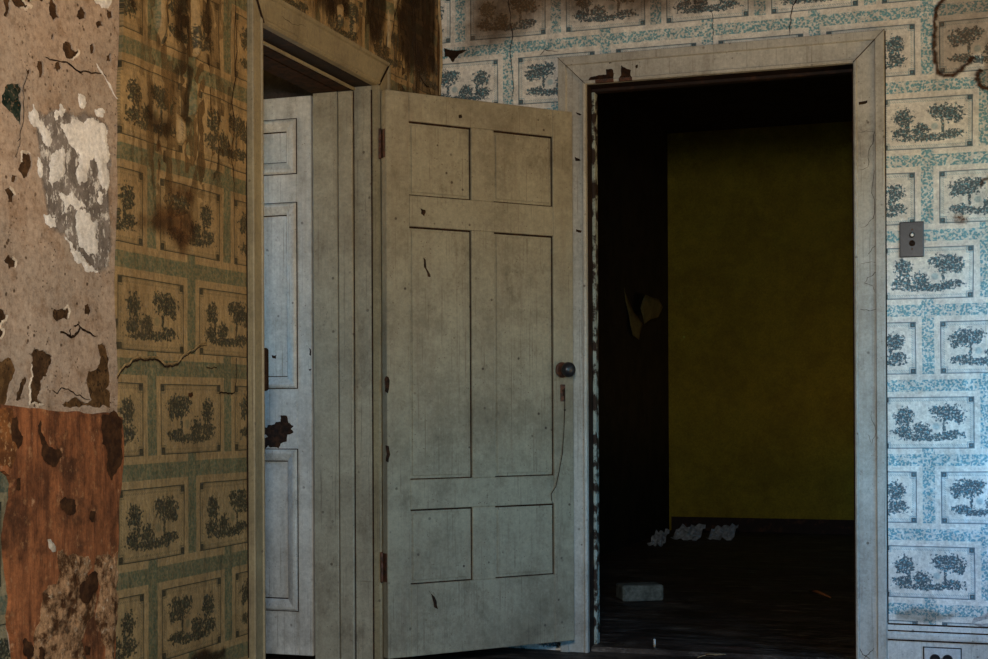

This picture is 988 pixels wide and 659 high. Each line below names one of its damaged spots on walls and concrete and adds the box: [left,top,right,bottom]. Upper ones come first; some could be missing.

leakage [313,0,349,17]
leakage [359,0,435,93]
crack [45,57,118,99]
leakage [148,0,231,250]
peeling [4,93,112,273]
spalling [0,309,8,340]
crack [60,324,97,338]
spalling [0,349,51,407]
spalling [62,343,110,408]
crack [117,343,237,395]